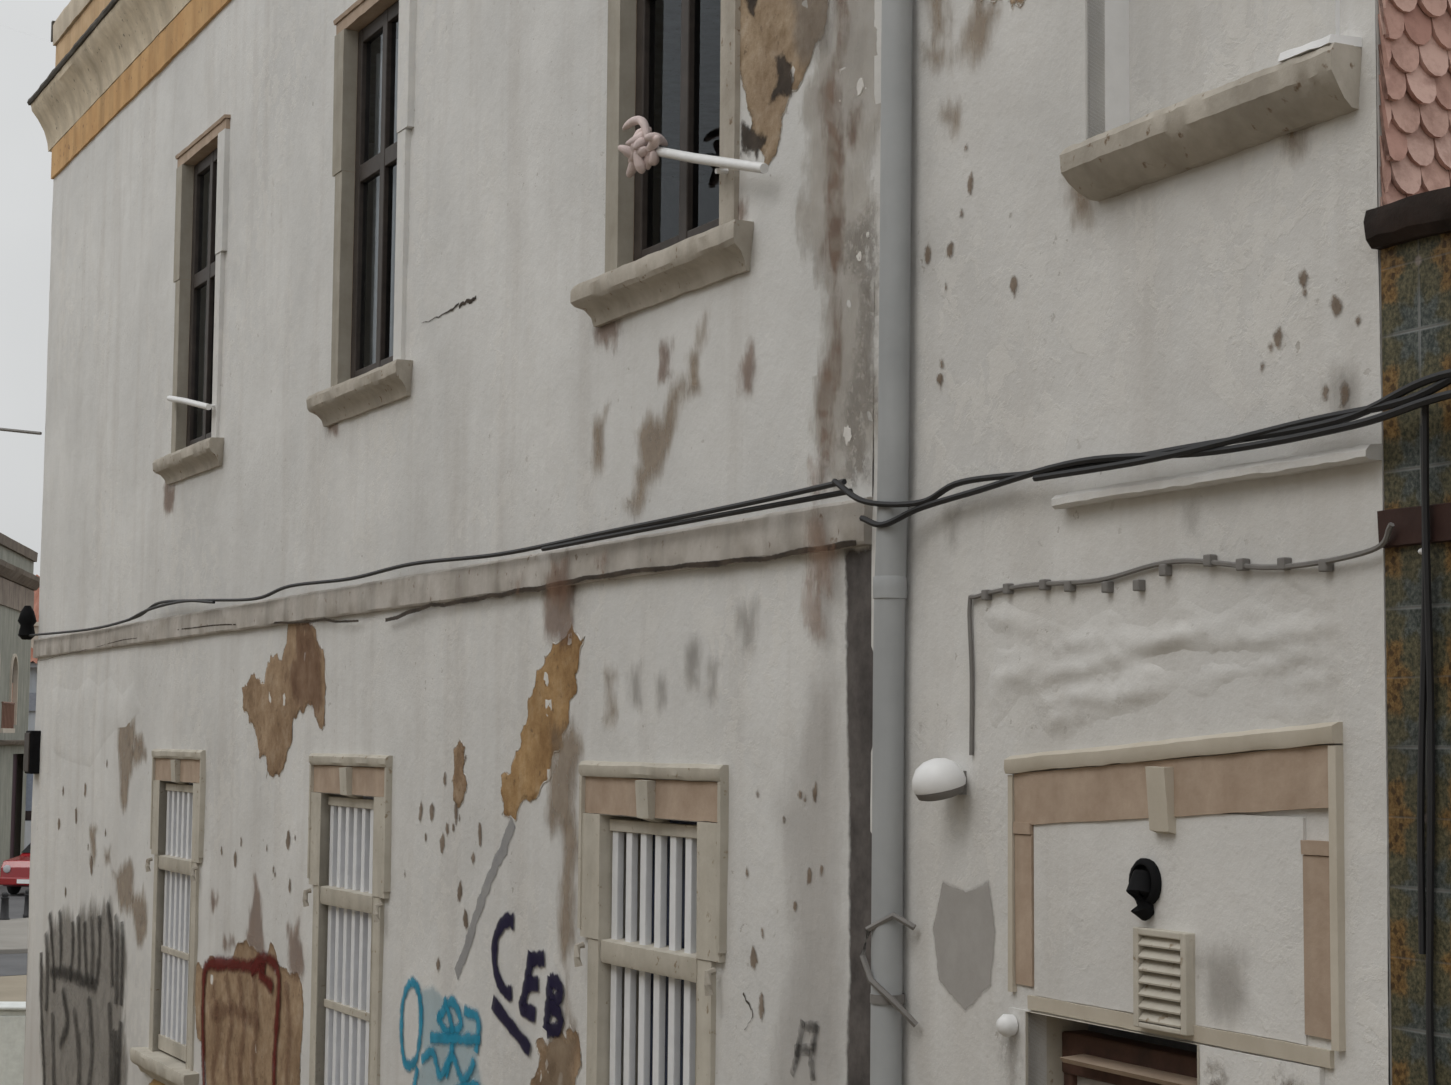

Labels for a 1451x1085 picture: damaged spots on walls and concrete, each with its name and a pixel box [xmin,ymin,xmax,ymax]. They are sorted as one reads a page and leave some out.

spalling [740,0,829,166]
crack [423,296,476,323]
spalling [242,623,327,779]
spalling [500,586,585,828]
spalling [418,737,468,853]
spalling [457,881,468,928]
spalling [195,939,304,1085]
spalling [530,1025,582,1085]